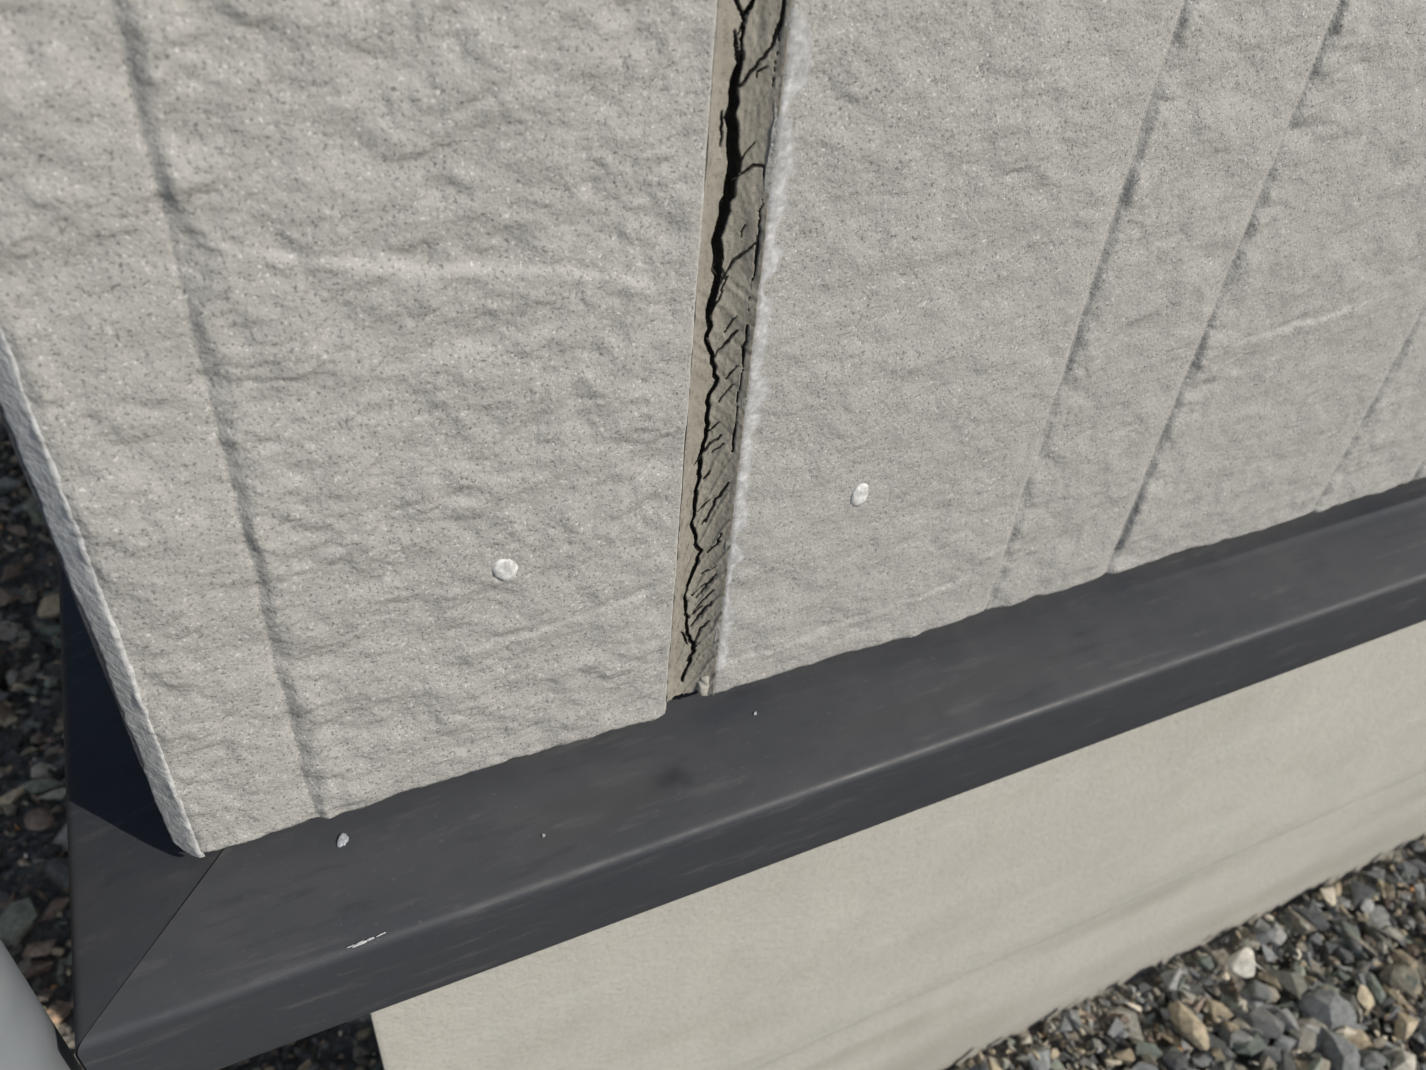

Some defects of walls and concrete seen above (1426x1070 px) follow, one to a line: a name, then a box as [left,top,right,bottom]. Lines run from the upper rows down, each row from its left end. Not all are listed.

crack [681,0,786,682]